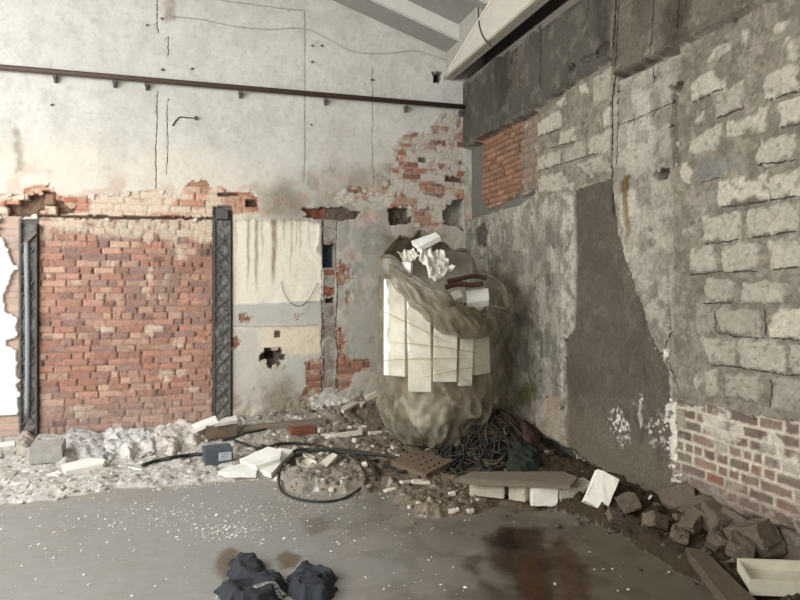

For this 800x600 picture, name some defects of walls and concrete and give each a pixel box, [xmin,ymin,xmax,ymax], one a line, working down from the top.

crack [610,0,676,214]
flaking render [0,177,259,221]
flaking render [325,110,469,228]
flaking render [475,120,524,209]
corrosion [622,175,630,226]
flaking render [323,244,354,305]
flaking render [0,236,21,415]
spalling [260,347,286,370]
flaking render [299,356,324,409]
flaking render [331,325,371,405]
flaking render [539,178,800,560]
leakage [609,408,630,446]